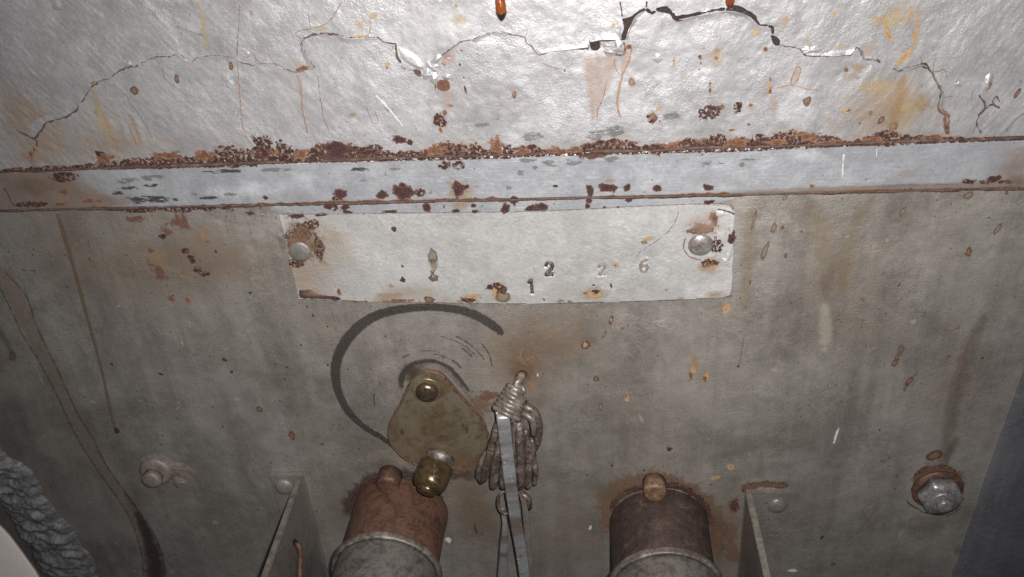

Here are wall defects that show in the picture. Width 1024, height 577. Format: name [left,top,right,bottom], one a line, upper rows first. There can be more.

crack [12,2,397,147]
crack [441,1,1024,134]
corrosion [872,3,894,42]
corrosion [895,7,918,65]
corrosion [3,79,1024,271]
corrosion [180,248,210,277]
corrosion [599,464,789,561]
corrosion [913,450,964,484]